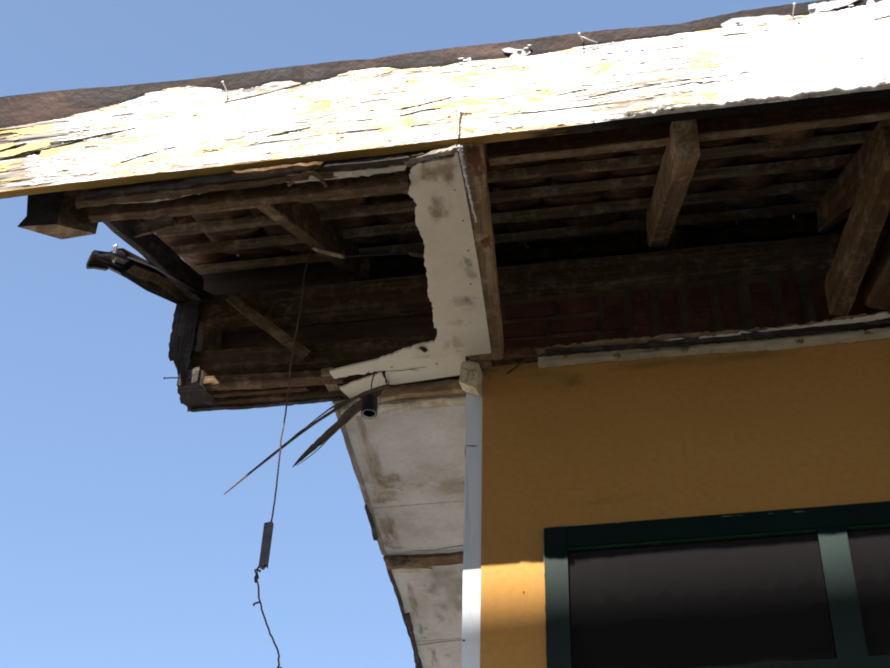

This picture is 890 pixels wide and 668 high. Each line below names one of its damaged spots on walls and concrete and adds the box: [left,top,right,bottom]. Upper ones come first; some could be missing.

peeling [0,0,890,186]